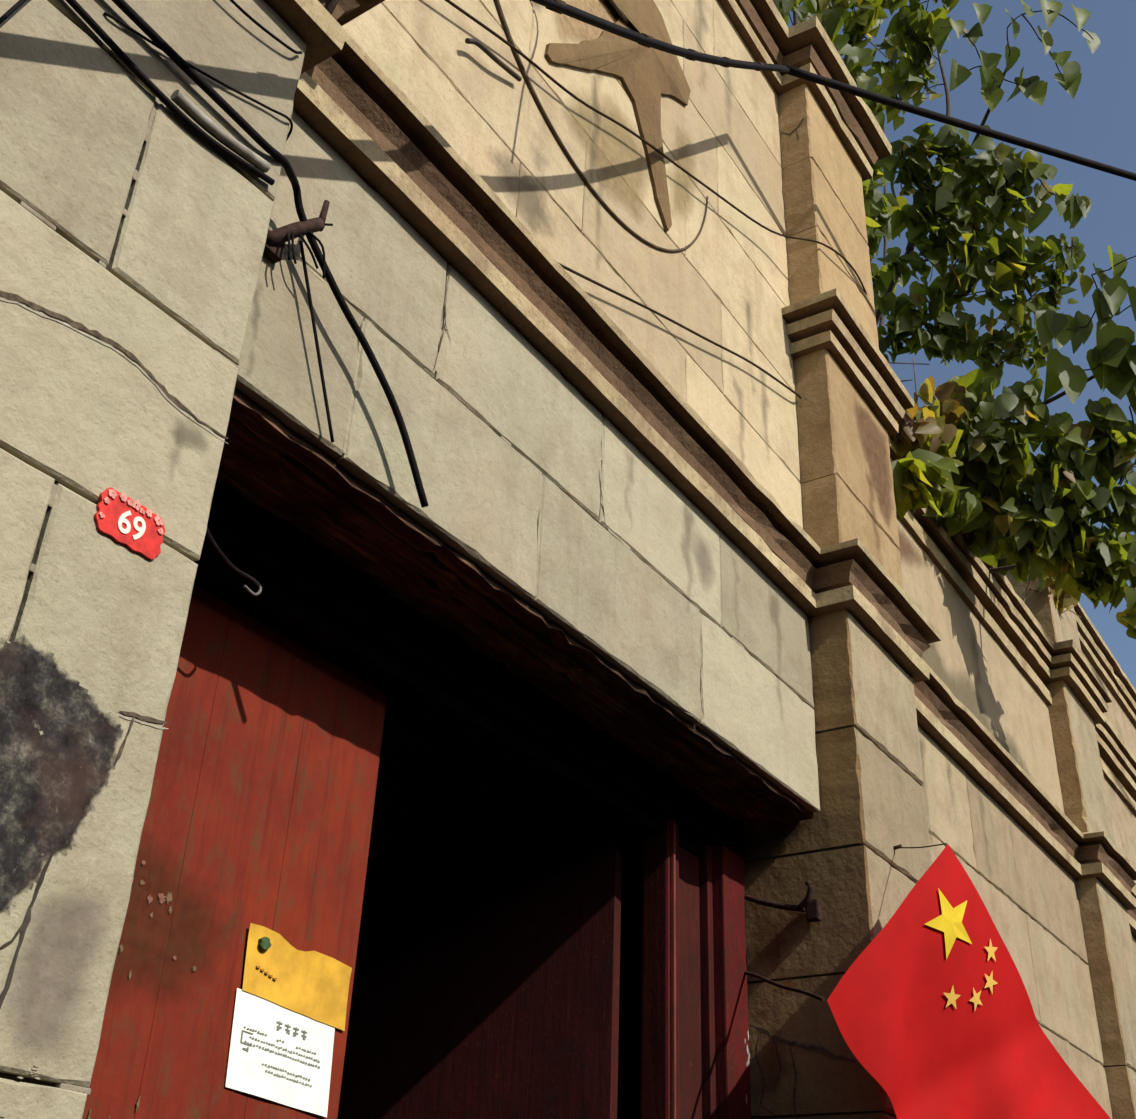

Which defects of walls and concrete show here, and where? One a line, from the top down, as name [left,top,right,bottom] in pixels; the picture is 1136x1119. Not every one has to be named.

crack [0,290,228,443]
crack [0,840,58,1014]
crack [749,1025,856,1119]